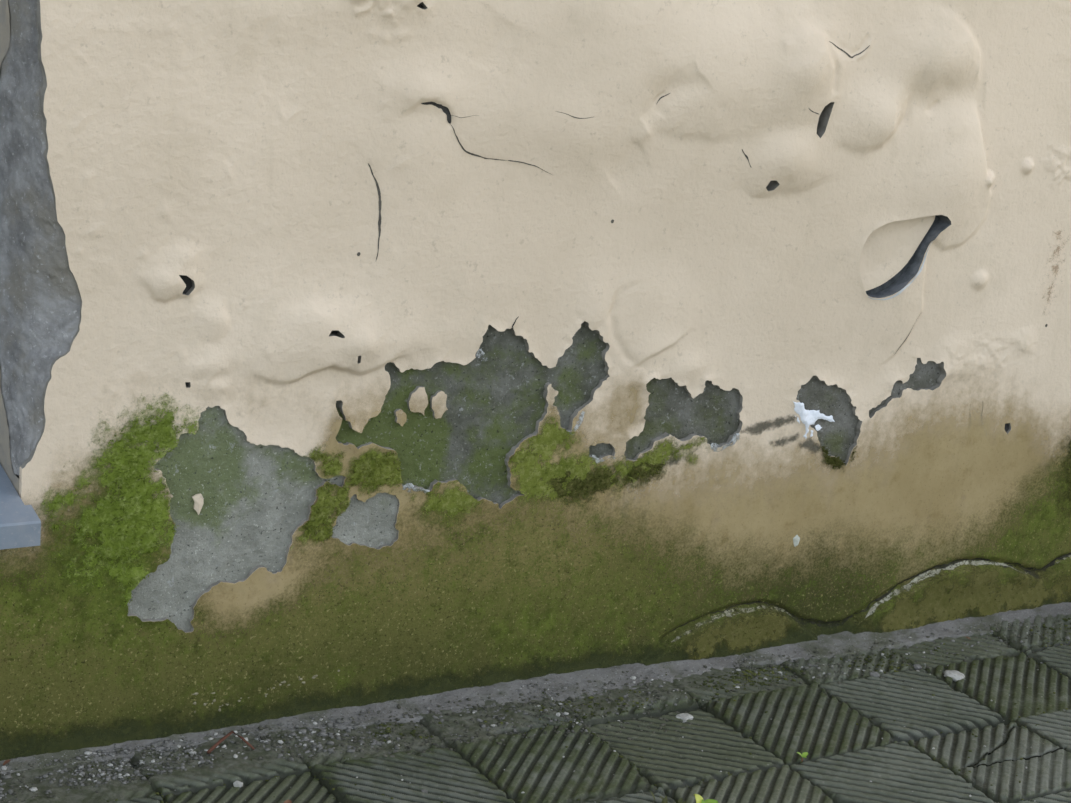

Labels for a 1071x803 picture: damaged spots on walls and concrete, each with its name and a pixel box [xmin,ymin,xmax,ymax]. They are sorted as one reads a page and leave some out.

crack [421,102,550,174]
spalling [0,0,82,475]
crack [368,163,381,260]
peeling [332,317,610,549]
peeling [589,377,743,463]
peeling [796,358,946,465]
damp [0,481,119,576]
peeling [127,406,346,633]
damp [192,386,1071,632]
crack [667,553,1071,642]
damp [0,622,890,761]